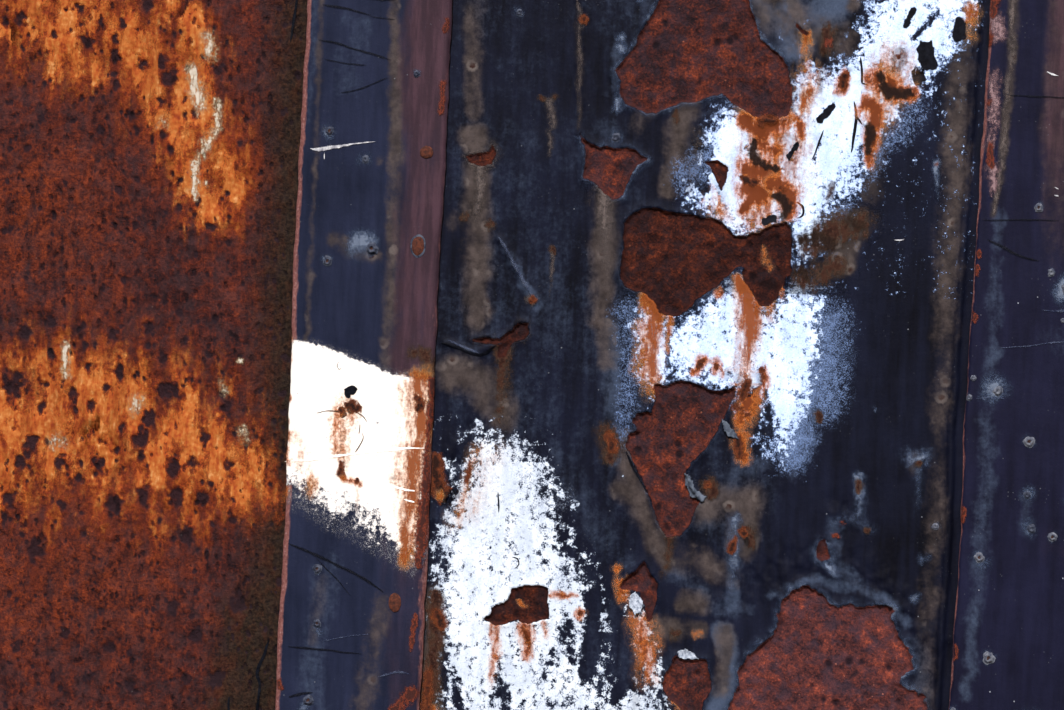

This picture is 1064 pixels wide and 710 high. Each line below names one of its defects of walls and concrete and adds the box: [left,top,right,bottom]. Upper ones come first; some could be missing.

corrosion [0,0,249,231]
peeling [615,0,793,124]
corrosion [716,76,815,226]
corrosion [855,46,919,168]
peeling [581,136,792,569]
corrosion [0,335,288,545]
corrosion [333,399,362,487]
corrosion [394,346,472,569]
peeling [483,585,549,680]
peeling [616,562,658,680]
peeling [662,648,712,710]
peeling [727,584,927,710]